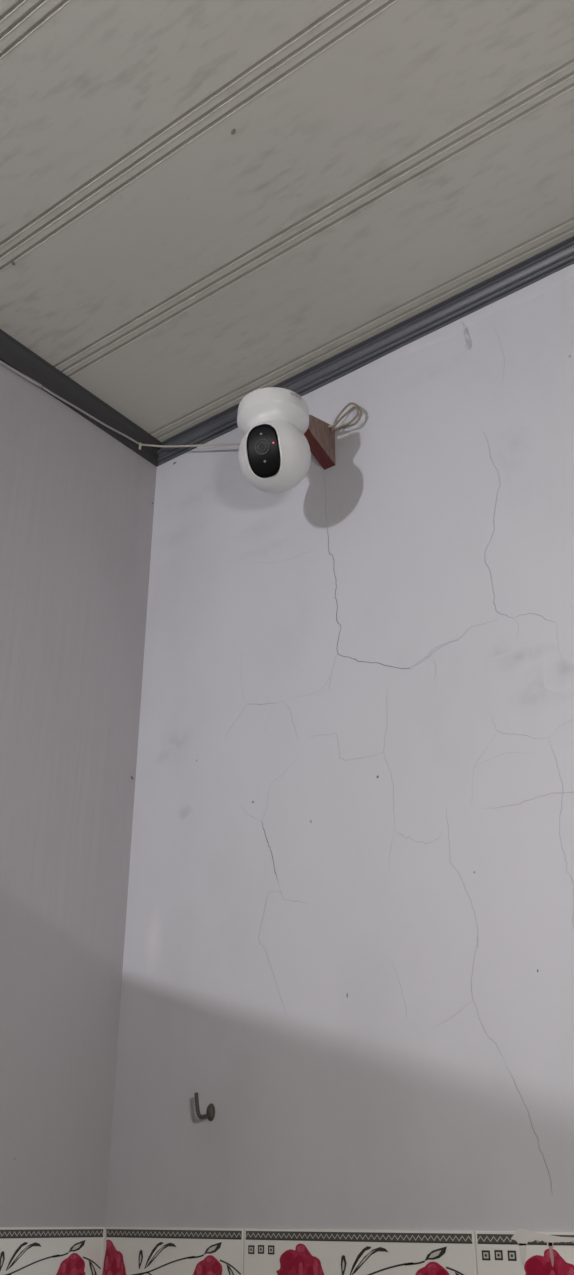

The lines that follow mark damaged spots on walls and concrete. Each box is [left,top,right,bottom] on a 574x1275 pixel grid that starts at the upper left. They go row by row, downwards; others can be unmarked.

crack [225,434,574,1192]